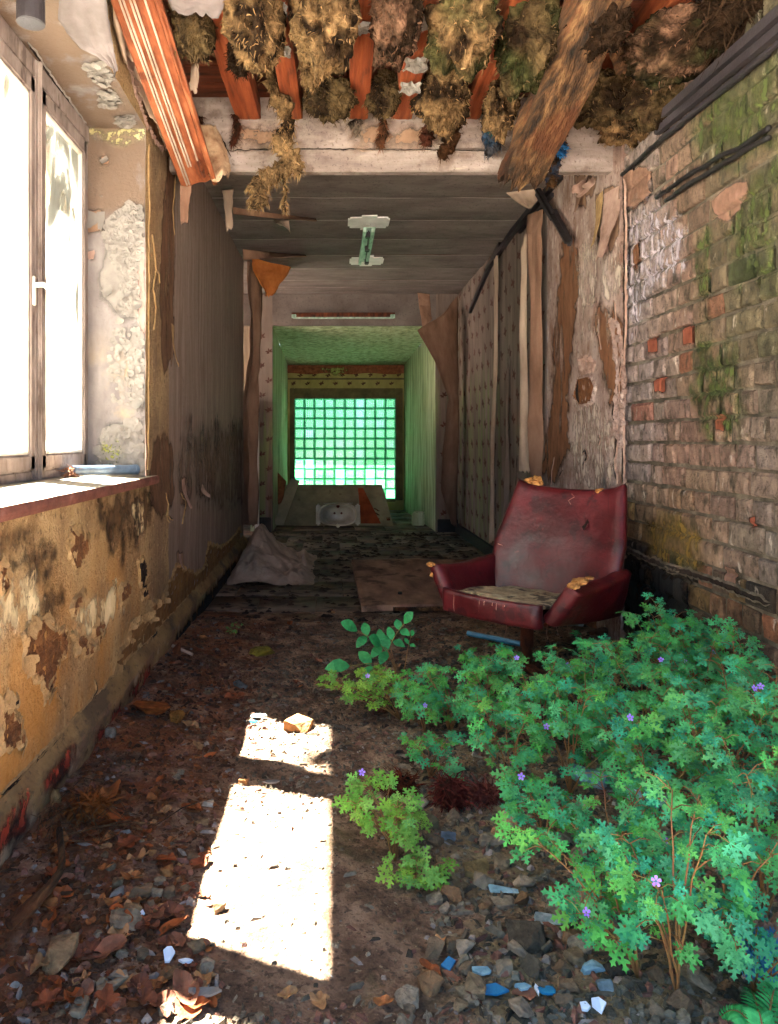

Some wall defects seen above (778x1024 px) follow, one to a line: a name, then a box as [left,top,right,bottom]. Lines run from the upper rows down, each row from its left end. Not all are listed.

flaking render [81,51,167,152]
flaking render [572,175,621,262]
peeling [137,244,145,334]
flaking render [573,354,597,407]
leakage [96,416,243,563]
flaking render [0,555,14,602]
leakage [0,528,65,634]
flaking render [20,522,106,707]
leakage [76,579,116,634]